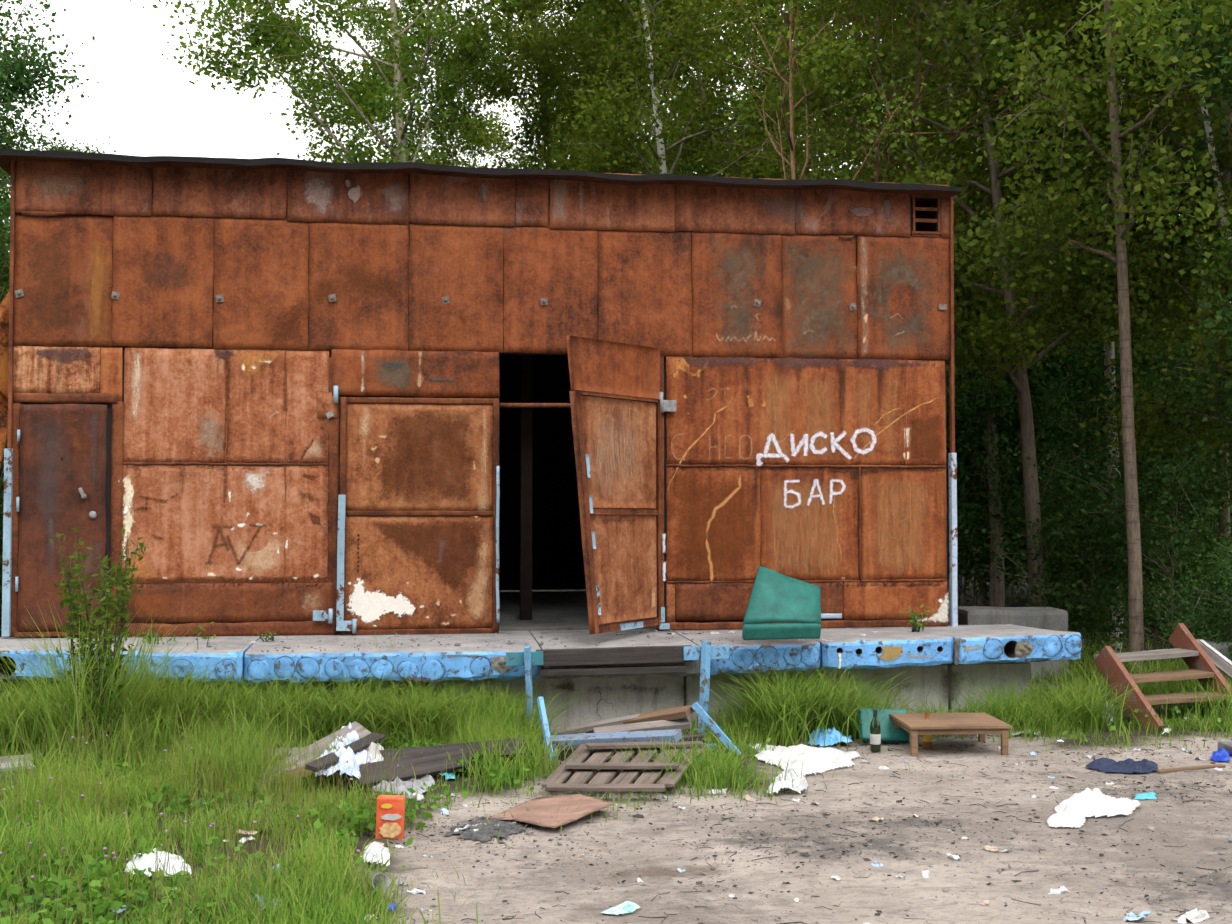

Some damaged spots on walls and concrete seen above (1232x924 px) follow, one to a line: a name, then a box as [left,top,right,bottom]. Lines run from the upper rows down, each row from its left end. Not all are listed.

corrosion [204,302,303,498]
corrosion [684,356,933,413]
corrosion [380,410,473,502]
peeling [122,478,134,560]
corrosion [127,559,321,587]
peeling [347,578,440,627]
corrosion [377,521,482,590]
peeling [441,543,487,625]
corrosion [673,415,942,587]